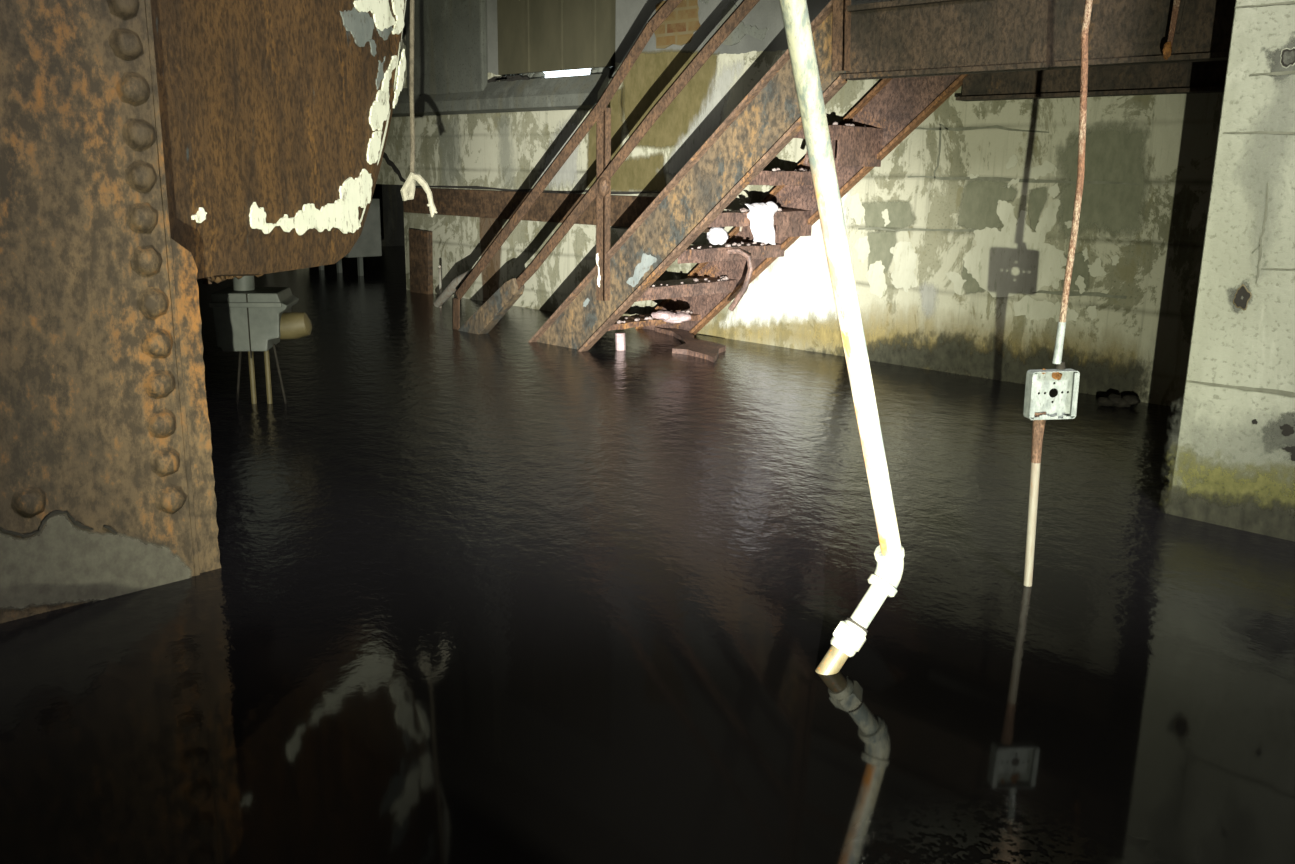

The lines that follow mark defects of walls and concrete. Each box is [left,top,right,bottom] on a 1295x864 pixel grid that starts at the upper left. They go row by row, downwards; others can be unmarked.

peeling [249,0,407,235]
peeling [191,207,207,223]
rust [480,217,502,302]
water stain [700,219,845,357]
water stain [841,193,915,273]
peeling [844,193,918,298]
water stain [961,262,984,294]
peeling [942,154,1120,322]
water stain [863,321,1146,398]
water stain [1262,412,1295,454]
water stain [1164,486,1295,542]
rust [0,514,191,609]